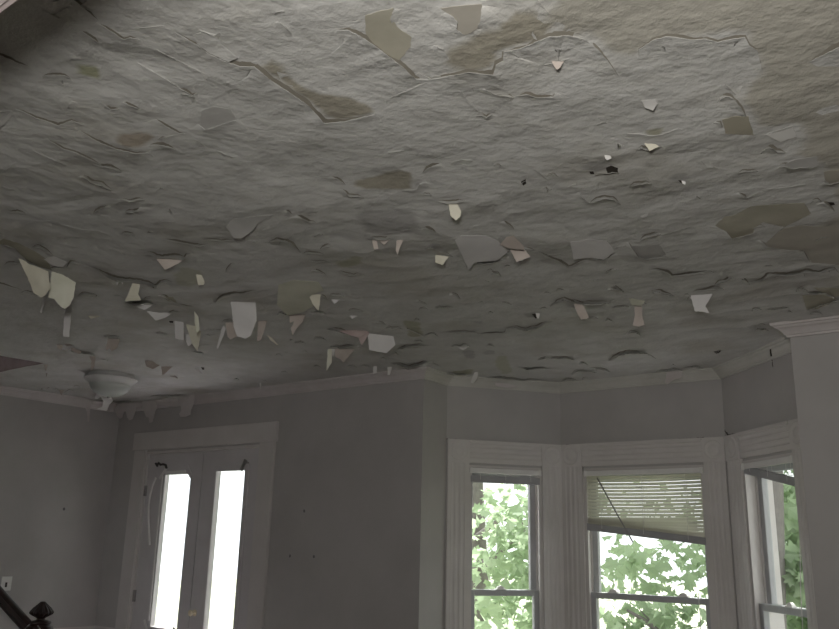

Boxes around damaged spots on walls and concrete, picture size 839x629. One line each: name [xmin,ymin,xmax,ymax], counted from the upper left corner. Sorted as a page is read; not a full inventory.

peeling [40,0,381,146]
peeling [326,0,619,121]
peeling [712,85,753,135]
peeling [29,127,158,174]
peeling [326,159,494,220]
flaking render [572,155,621,177]
peeling [707,198,835,242]
peeling [0,239,108,370]
peeling [123,283,204,354]
peeling [215,290,285,357]
peeling [276,280,438,375]
peeling [540,267,839,336]